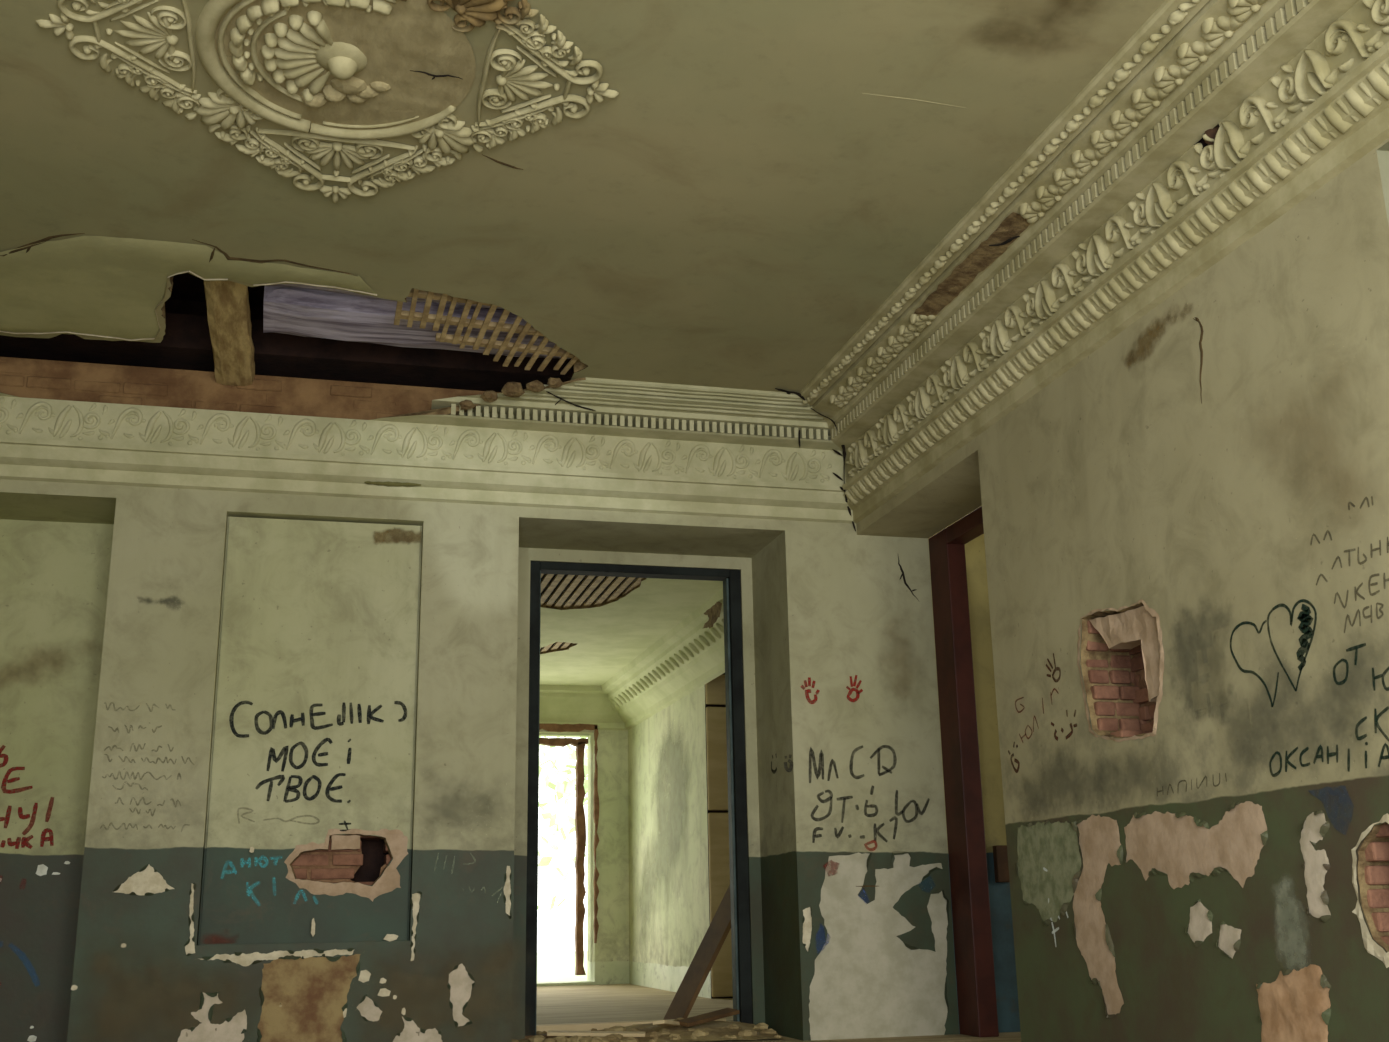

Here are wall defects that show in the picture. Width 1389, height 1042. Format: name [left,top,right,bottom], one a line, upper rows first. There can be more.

spalling [161,273,207,316]
flaking render [0,357,502,420]
spalling [248,285,265,320]
crack [1193,317,1204,403]
spalling [1077,599,1164,742]
flaking render [113,864,476,1042]
spalling [284,829,422,961]
peeling [802,851,949,1041]
peeling [1016,801,1268,1019]
flaking render [1256,964,1331,1042]
peeling [1299,810,1332,923]
spalling [1351,813,1389,968]